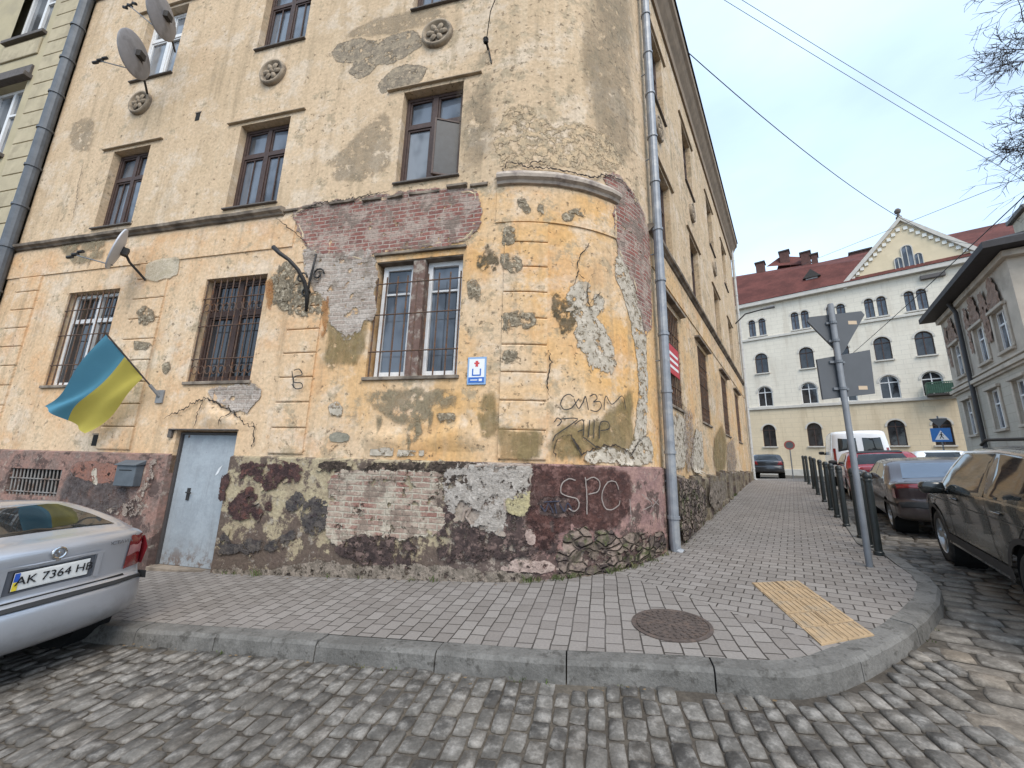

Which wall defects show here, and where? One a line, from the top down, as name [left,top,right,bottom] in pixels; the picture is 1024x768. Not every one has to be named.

flaking render [331,30,427,93]
spalling [265,187,483,340]
peeling [493,104,654,467]
crack [573,240,601,312]
crack [164,396,255,448]
peeling [208,383,261,413]
spalling [212,447,667,583]
leakage [334,533,417,570]